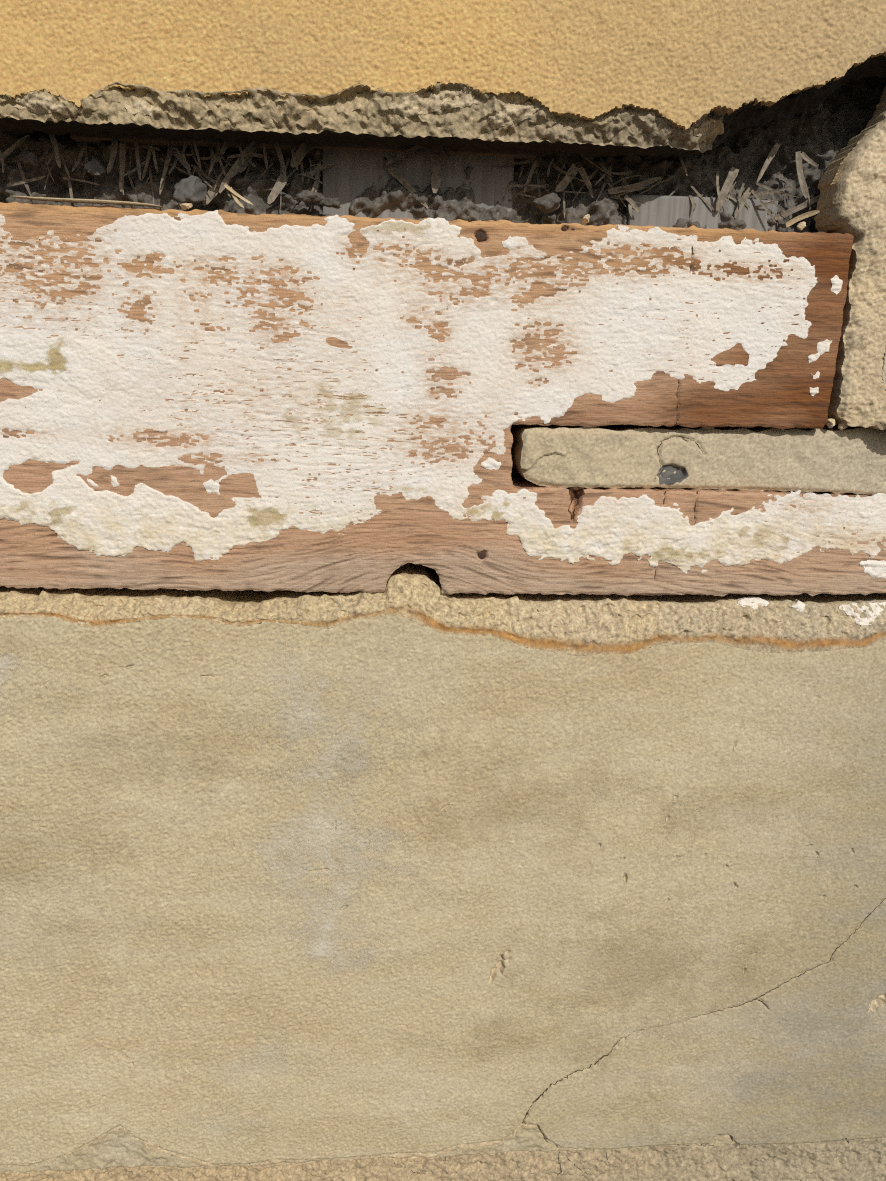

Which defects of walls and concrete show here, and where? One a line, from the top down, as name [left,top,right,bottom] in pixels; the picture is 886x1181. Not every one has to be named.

peeling [0,55,886,579]
spalling [0,563,886,656]
crack [522,898,886,1123]